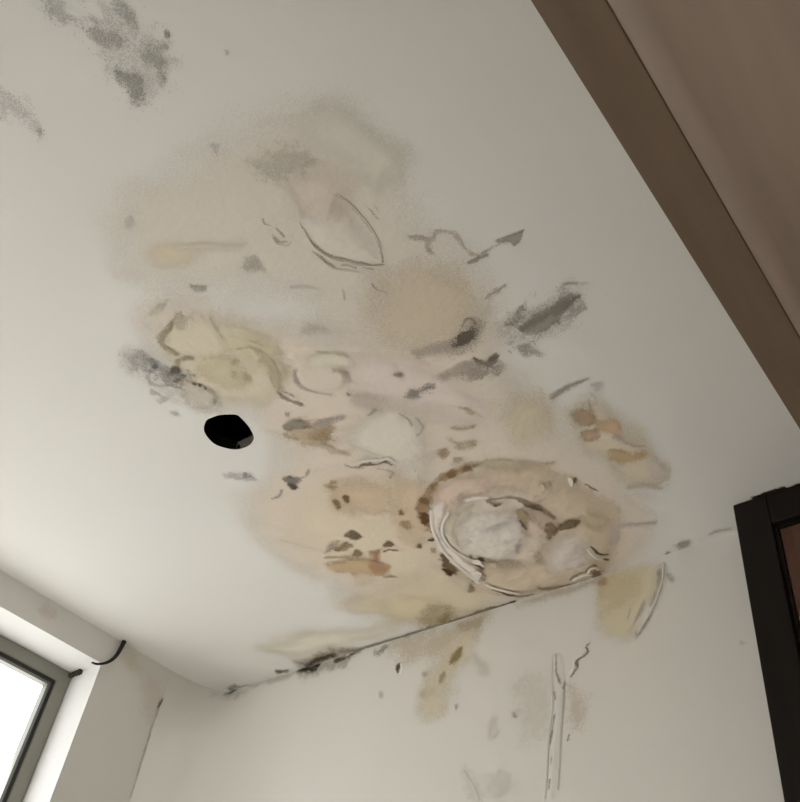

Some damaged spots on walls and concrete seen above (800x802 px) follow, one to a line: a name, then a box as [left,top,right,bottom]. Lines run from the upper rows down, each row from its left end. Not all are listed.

mould [38,0,184,114]
mould [0,85,50,142]
water stain [87,70,692,734]
corrosion [326,548,391,577]
peeling [429,496,532,595]
spalling [543,522,558,541]
peeling [572,548,603,582]
crack [547,642,591,790]